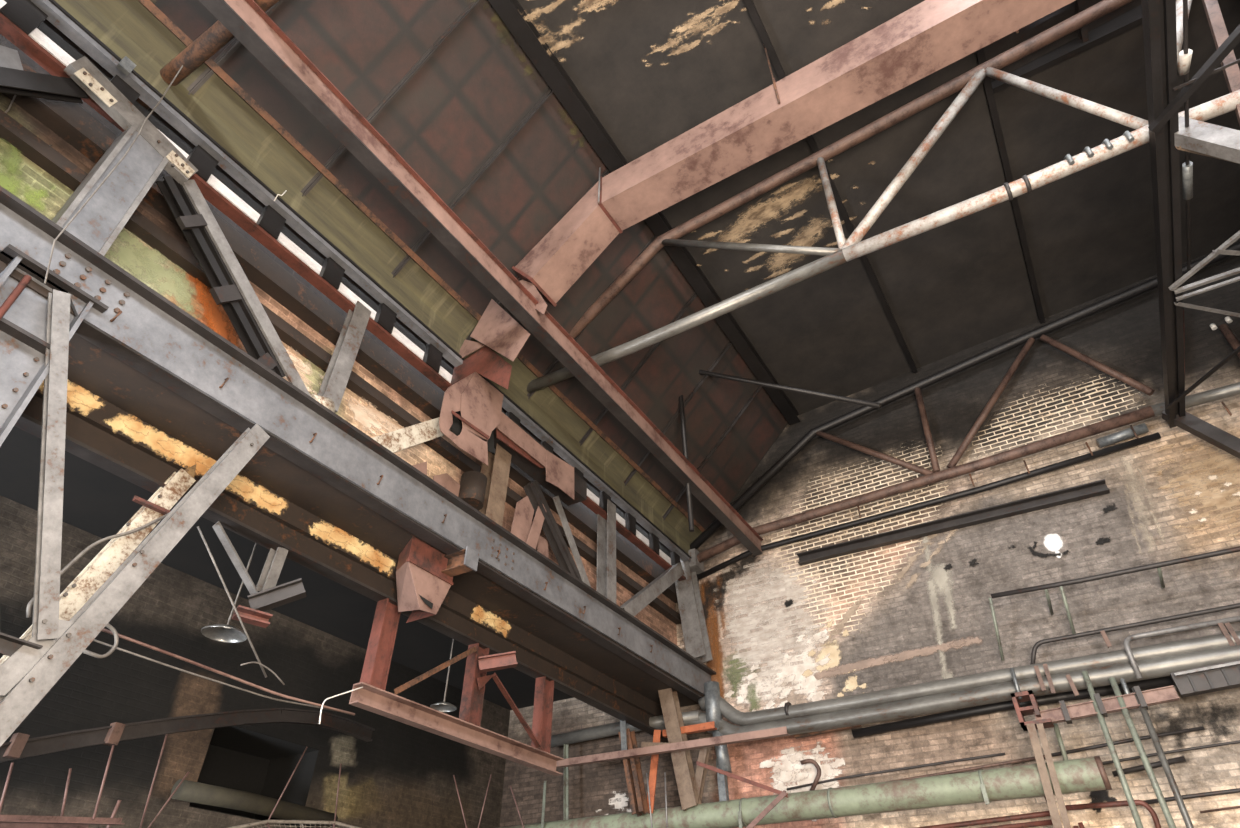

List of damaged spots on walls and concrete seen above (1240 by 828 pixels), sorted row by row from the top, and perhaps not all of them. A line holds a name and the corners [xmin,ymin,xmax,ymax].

corrosion [185,276,239,348]
peeling [106,414,217,476]
peeling [226,474,286,514]
peeling [310,521,395,576]
peeling [714,447,956,712]
peeling [759,742,845,794]